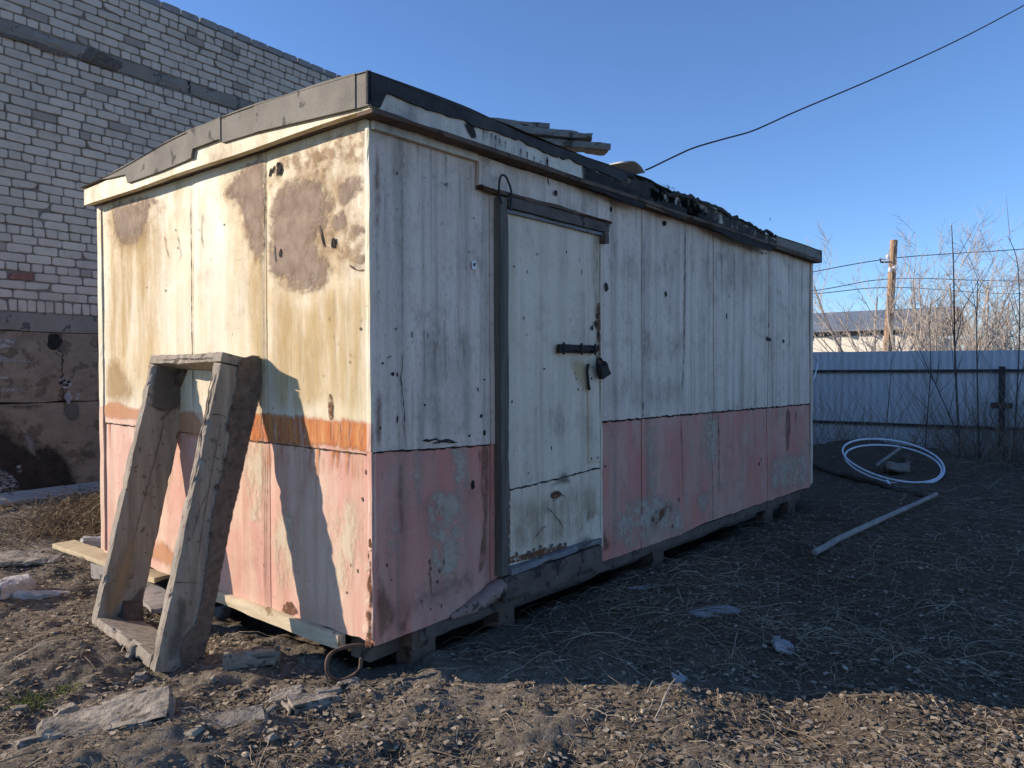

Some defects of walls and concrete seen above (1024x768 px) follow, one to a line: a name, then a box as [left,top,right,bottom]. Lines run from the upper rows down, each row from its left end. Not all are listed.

leakage [113,198,155,246]
leakage [226,155,264,260]
leakage [287,135,362,270]
crack [54,351,69,404]
corrosion [104,364,139,431]
corrosion [250,396,380,465]
peeling [617,496,683,547]